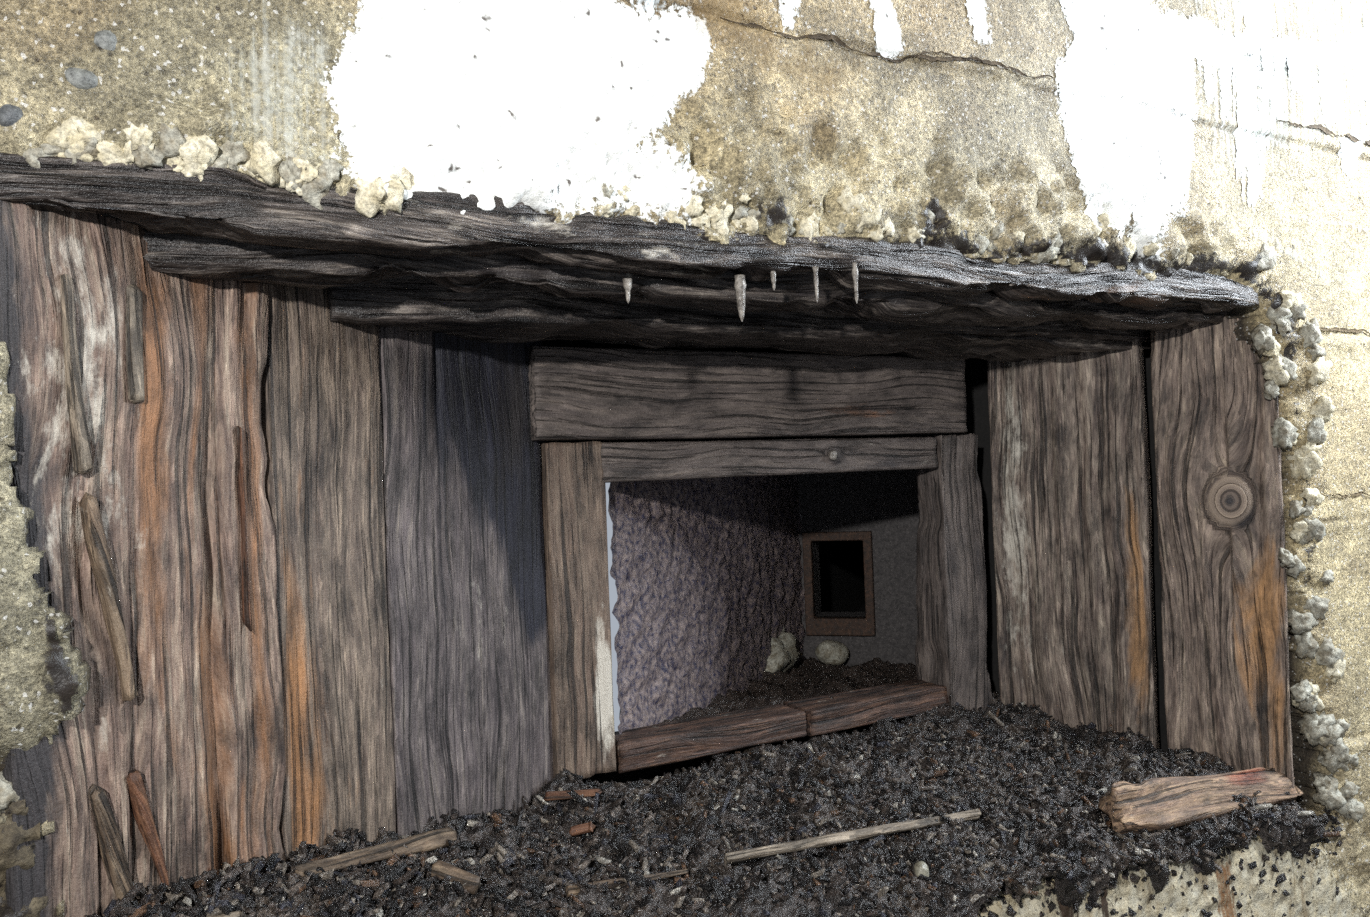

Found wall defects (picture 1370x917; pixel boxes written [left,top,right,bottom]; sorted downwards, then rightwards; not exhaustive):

crack [720,17,1053,78]
water stain [883,0,1370,361]
water stain [757,196,791,248]
water stain [1301,540,1316,587]
water stain [977,838,1363,917]